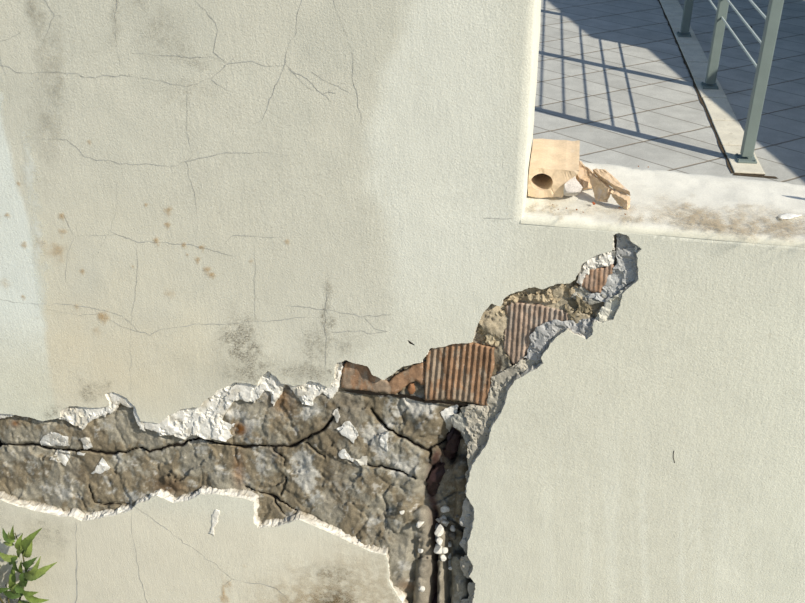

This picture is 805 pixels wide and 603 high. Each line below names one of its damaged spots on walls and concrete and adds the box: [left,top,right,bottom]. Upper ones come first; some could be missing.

crack [0,0,389,365]
spalling [0,233,642,603]
crack [367,464,415,478]
crack [339,390,468,458]
crack [72,525,80,603]
crack [89,486,284,603]